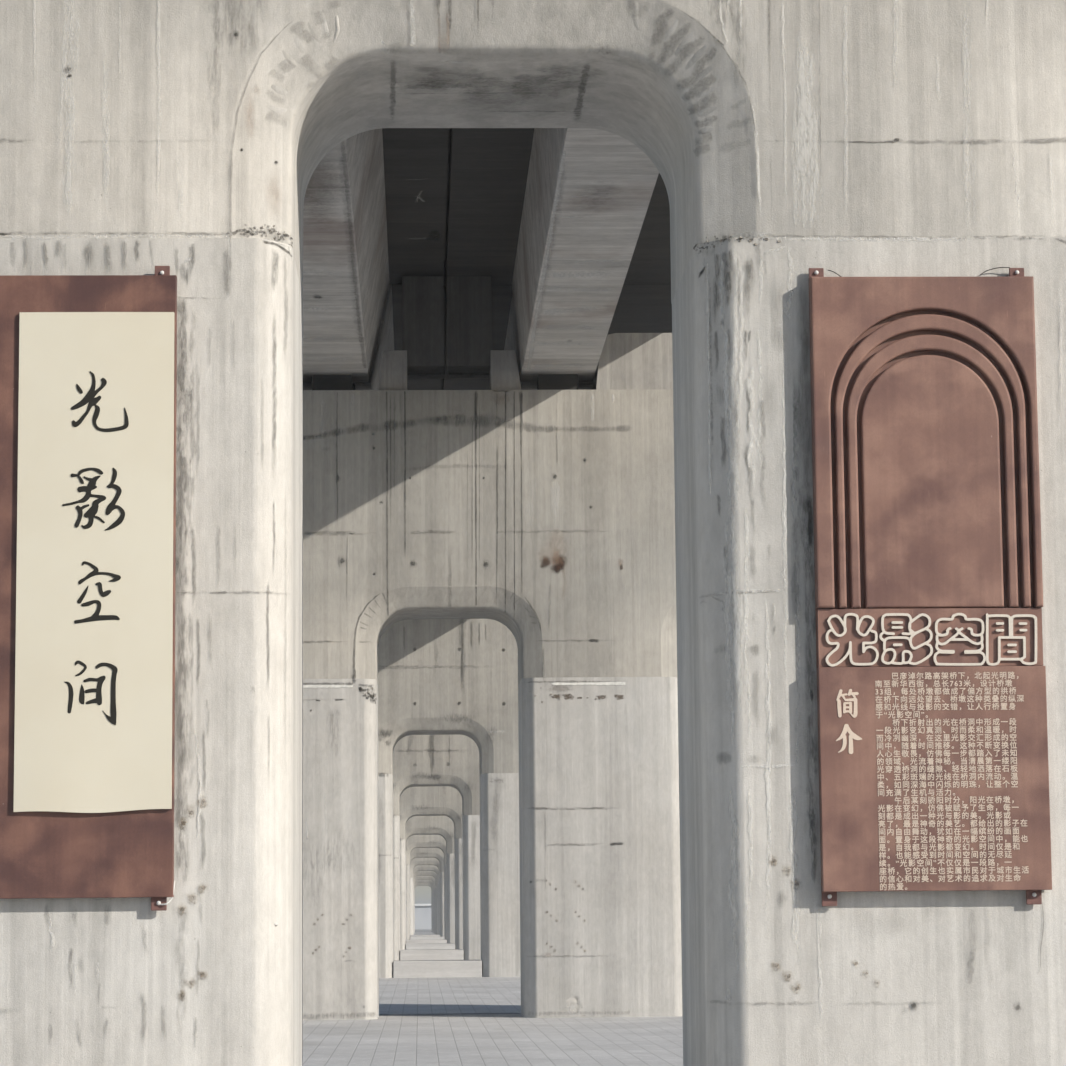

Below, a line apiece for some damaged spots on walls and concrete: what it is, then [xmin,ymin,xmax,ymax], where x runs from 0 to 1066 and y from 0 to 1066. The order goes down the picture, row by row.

corrosion [541,553,565,572]